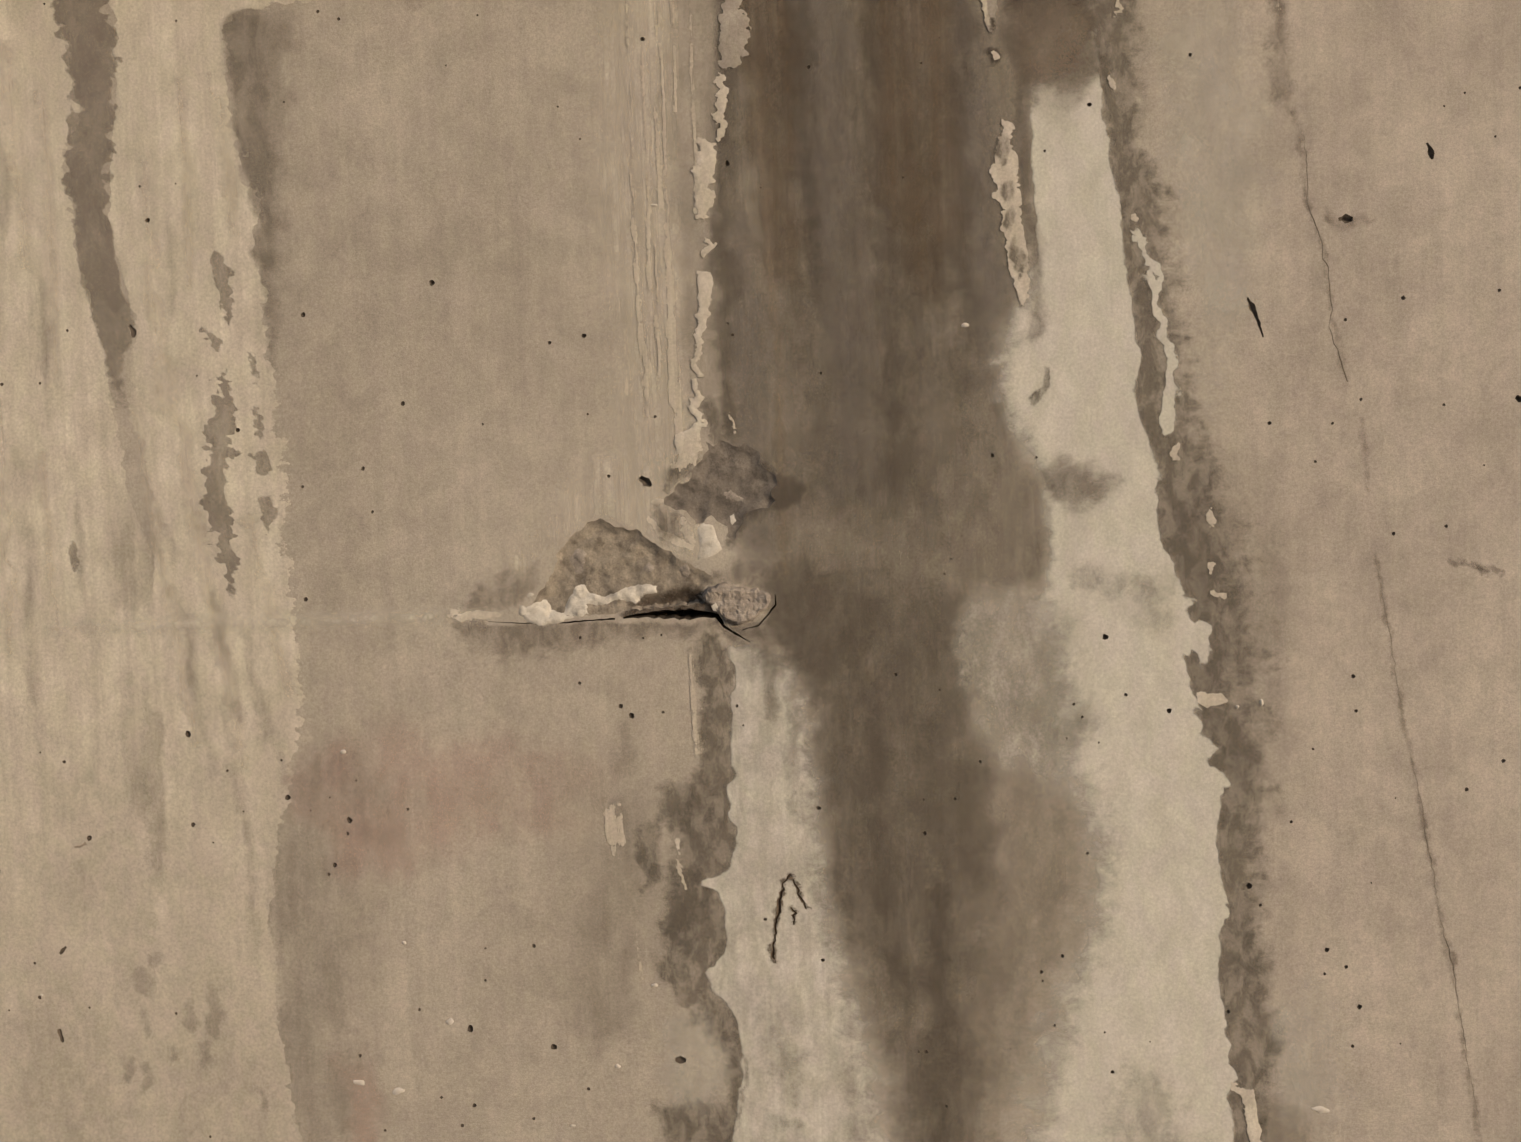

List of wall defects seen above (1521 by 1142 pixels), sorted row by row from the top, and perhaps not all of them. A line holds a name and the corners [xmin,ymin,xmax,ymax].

leakage [0,0,311,1142]
crack [488,594,777,642]
spalling [519,238,778,628]
leakage [606,0,700,481]
peeling [691,0,751,220]
leakage [636,0,1304,1142]
crack [1304,138,1348,382]
crack [768,873,809,963]